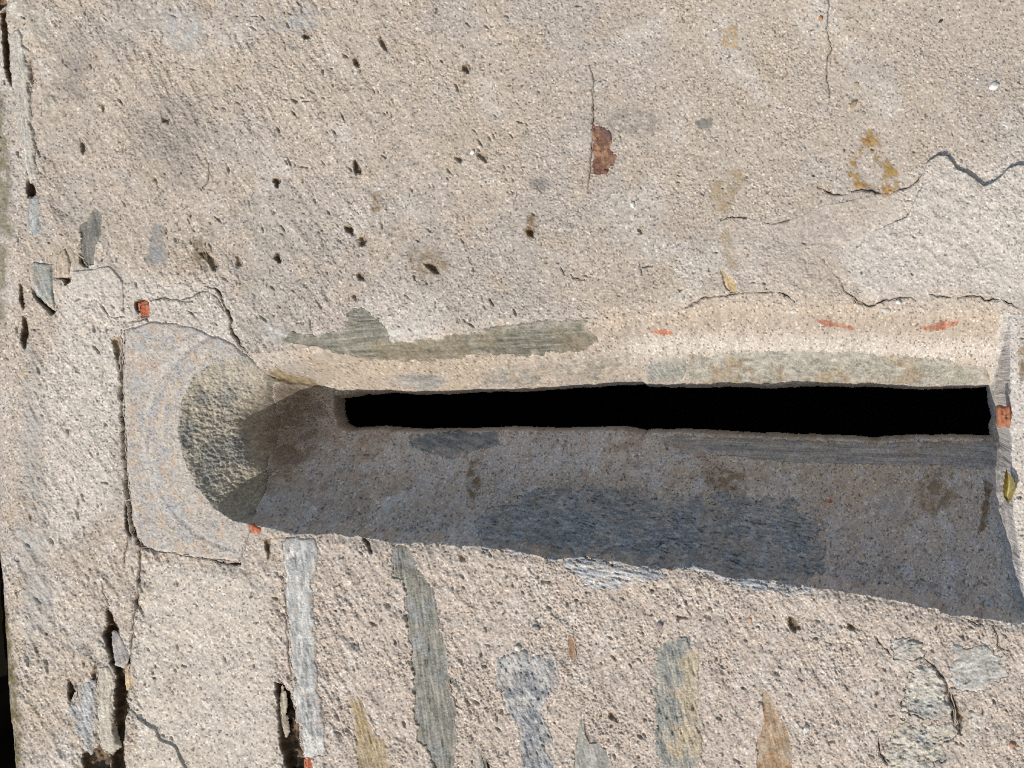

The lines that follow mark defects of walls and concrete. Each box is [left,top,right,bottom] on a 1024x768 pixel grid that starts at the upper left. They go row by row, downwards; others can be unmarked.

crack [825,0,833,97]
crack [818,173,923,210]
crack [686,284,794,309]
crack [841,284,1017,308]
crack [76,286,248,658]